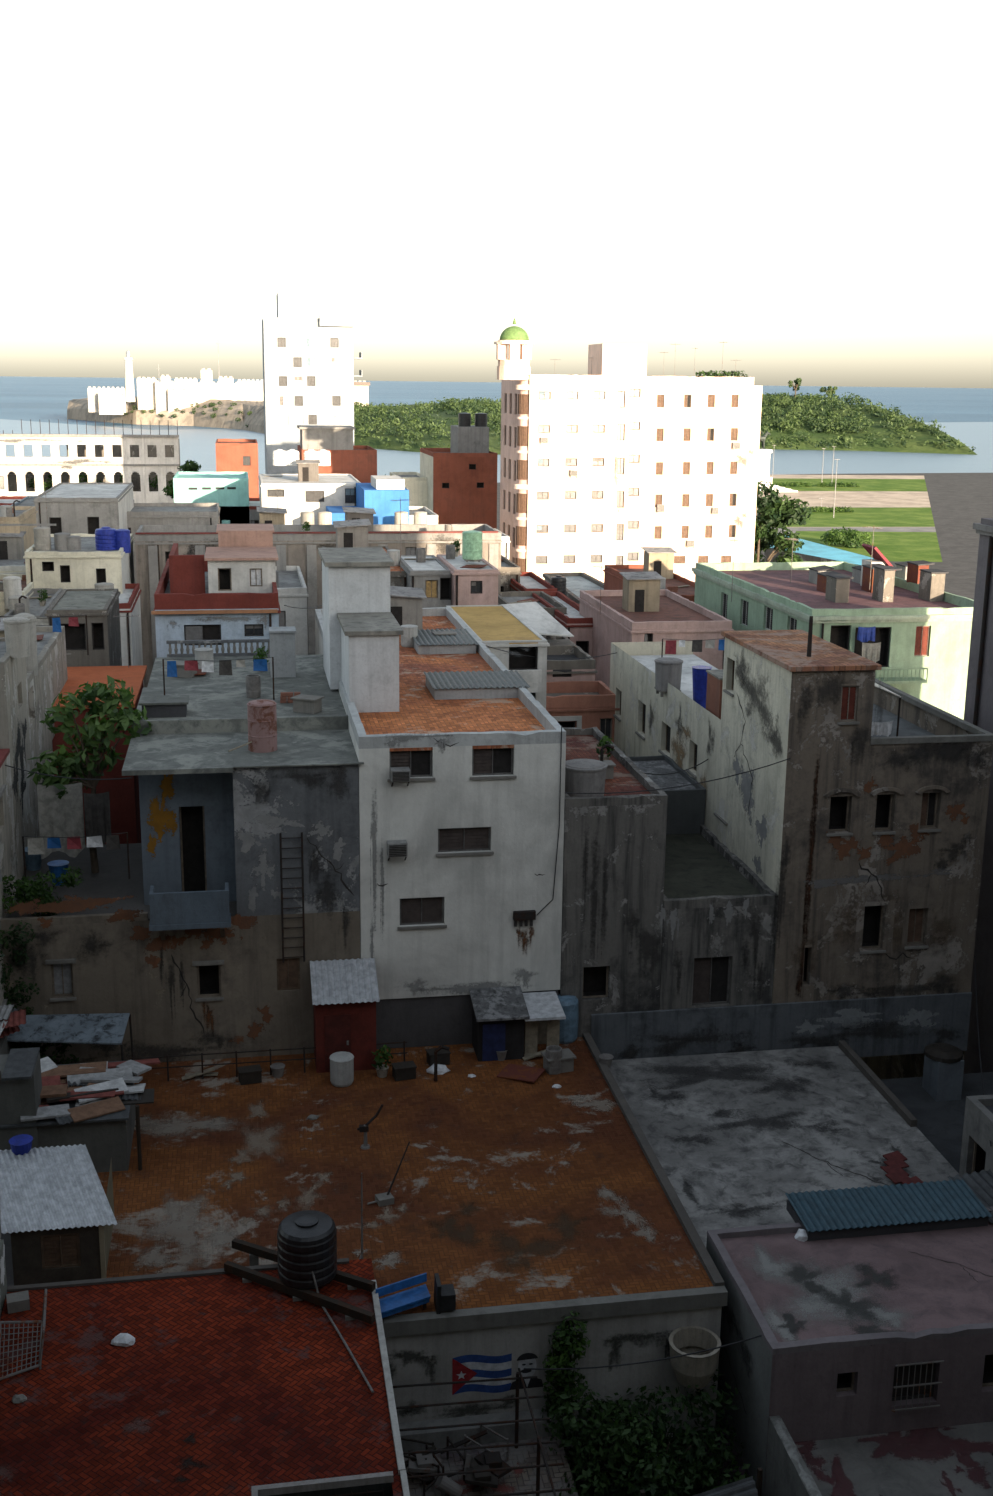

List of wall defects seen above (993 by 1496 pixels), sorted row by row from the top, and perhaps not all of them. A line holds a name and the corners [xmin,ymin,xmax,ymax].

peeling [146,774,178,860]
flaking render [4,815,349,969]